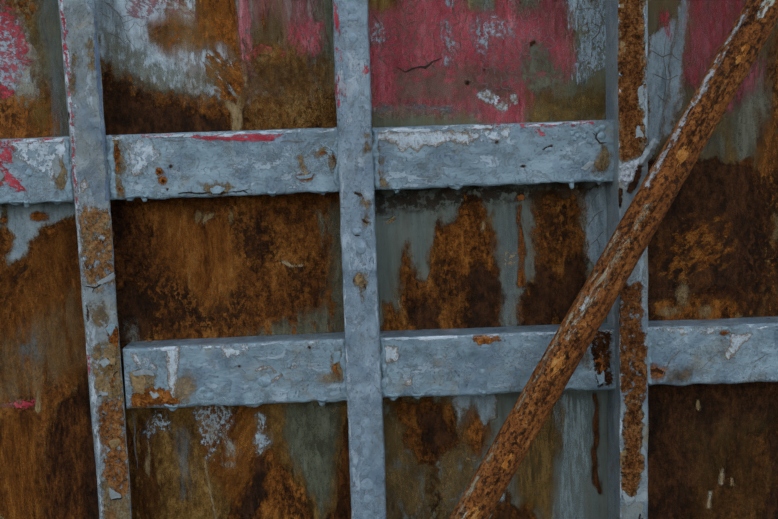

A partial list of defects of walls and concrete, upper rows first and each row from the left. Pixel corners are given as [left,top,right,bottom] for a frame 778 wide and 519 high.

peeling [0,4,39,96]
peeling [0,50,90,266]
crack [99,0,180,49]
peeling [86,0,237,102]
crack [370,0,556,93]
crack [574,0,605,65]
rust [581,0,655,175]
peeling [643,0,748,187]
rust [0,0,351,519]
rust [381,191,506,345]
rust [466,34,778,519]
rust [383,396,490,519]